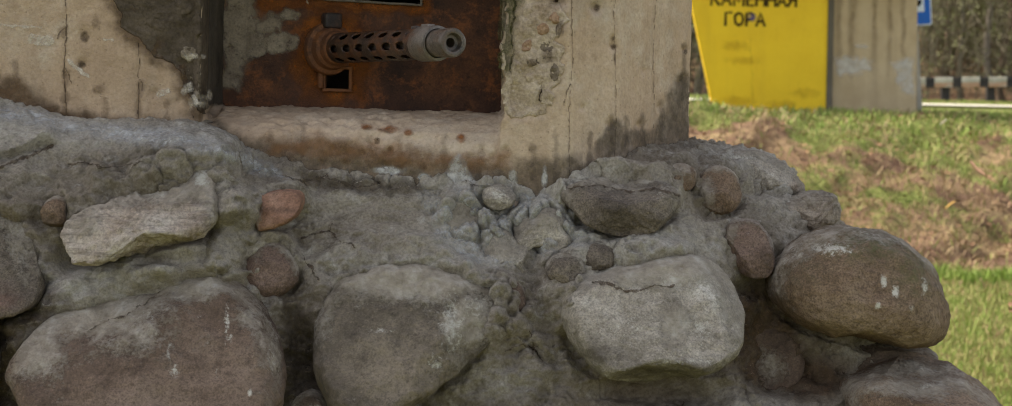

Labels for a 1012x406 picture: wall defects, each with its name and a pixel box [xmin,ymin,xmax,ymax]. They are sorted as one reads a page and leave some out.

spalling [114,0,210,114]
spalling [491,0,570,119]
crack [0,144,140,169]
damp [597,76,690,158]